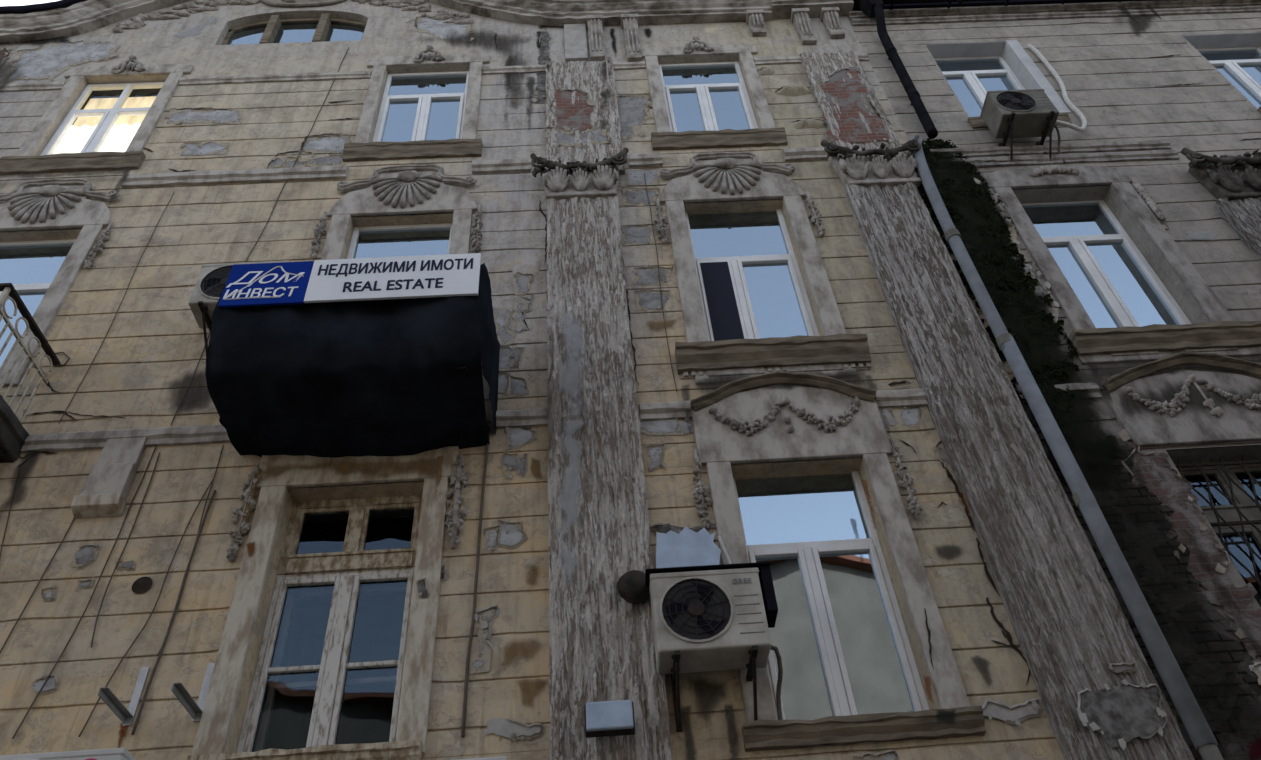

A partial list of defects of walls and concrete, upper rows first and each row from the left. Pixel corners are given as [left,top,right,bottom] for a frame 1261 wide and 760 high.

peeling [300,135,352,153]
water stain [447,32,550,117]
flaking render [532,31,594,134]
water stain [601,29,617,128]
peeling [617,94,652,139]
flaking render [815,66,894,143]
peeling [493,272,534,397]
peeling [498,426,537,479]
peeling [483,520,528,553]
flaking render [1020,398,1203,760]
flaking render [1091,429,1261,760]